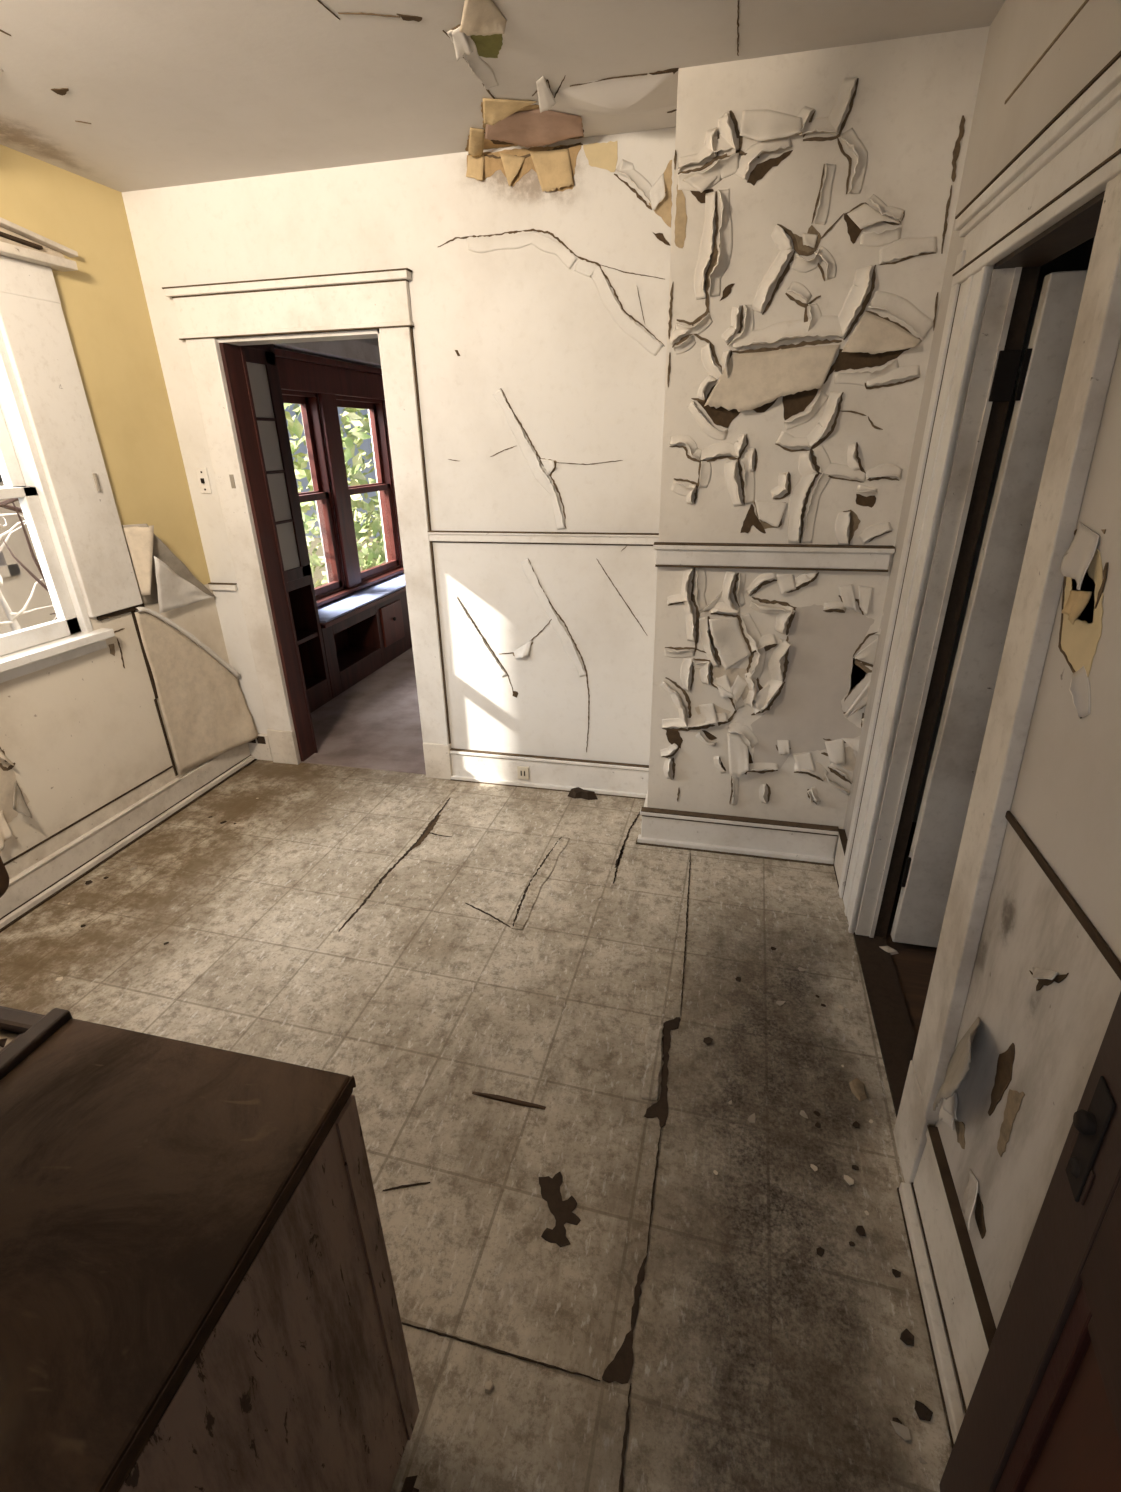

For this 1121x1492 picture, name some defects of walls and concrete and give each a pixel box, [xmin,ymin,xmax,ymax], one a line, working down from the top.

peeling [451,0,507,61]
crack [734,0,742,56]
crack [438,229,673,387]
peeling [465,76,937,545]
crack [448,388,623,530]
crack [521,558,590,752]
peeling [659,567,883,805]
peeling [1058,522,1109,719]
spalling [0,747,32,853]
peeling [933,1017,981,1149]
peeling [988,1043,1025,1157]
peeling [961,1168,986,1239]